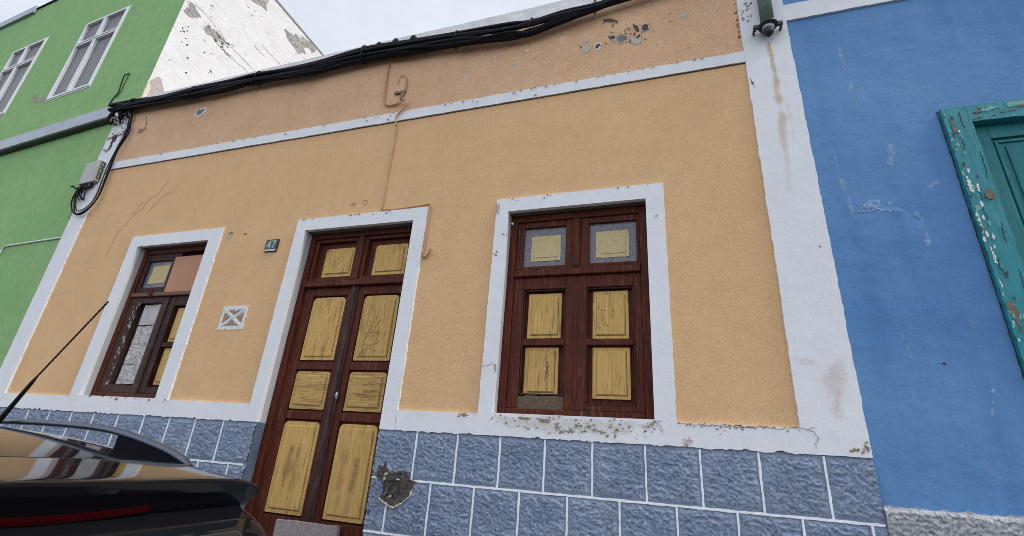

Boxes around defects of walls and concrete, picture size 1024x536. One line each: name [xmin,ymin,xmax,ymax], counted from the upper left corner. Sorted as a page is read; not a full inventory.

peeling [184,3,201,18]
peeling [284,29,316,54]
peeling [579,9,688,72]
peeling [142,77,164,97]
crack [104,180,172,258]
peeling [944,100,1024,342]
peeling [490,395,656,439]
spalling [376,461,415,507]